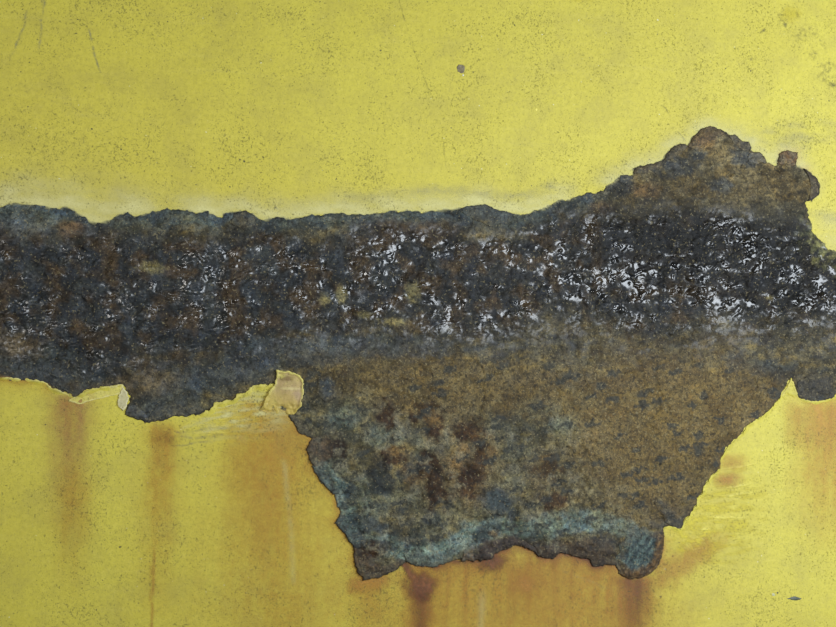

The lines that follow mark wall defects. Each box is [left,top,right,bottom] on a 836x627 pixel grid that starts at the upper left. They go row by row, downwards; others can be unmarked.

peeling [200,370,304,419]
rust [0,126,836,626]